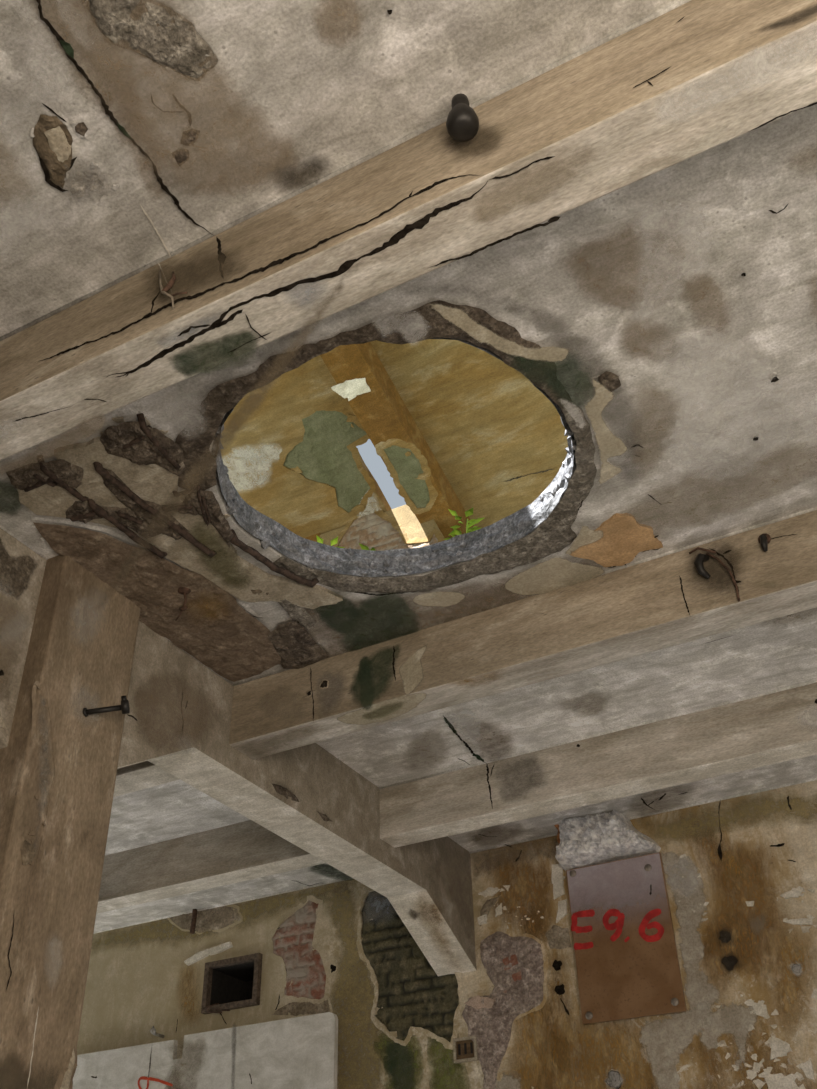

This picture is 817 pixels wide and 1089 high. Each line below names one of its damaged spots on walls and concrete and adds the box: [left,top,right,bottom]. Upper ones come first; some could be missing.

flaking render [79,0,225,86]
spalling [25,103,97,193]
crack [13,0,560,422]
water stain [104,284,342,600]
spalling [0,300,663,682]
water stain [567,359,816,528]
crack [444,717,495,809]
flaking render [267,895,338,1019]
flaking render [356,864,574,1089]
rust [695,831,779,984]
peeling [715,994,814,1089]